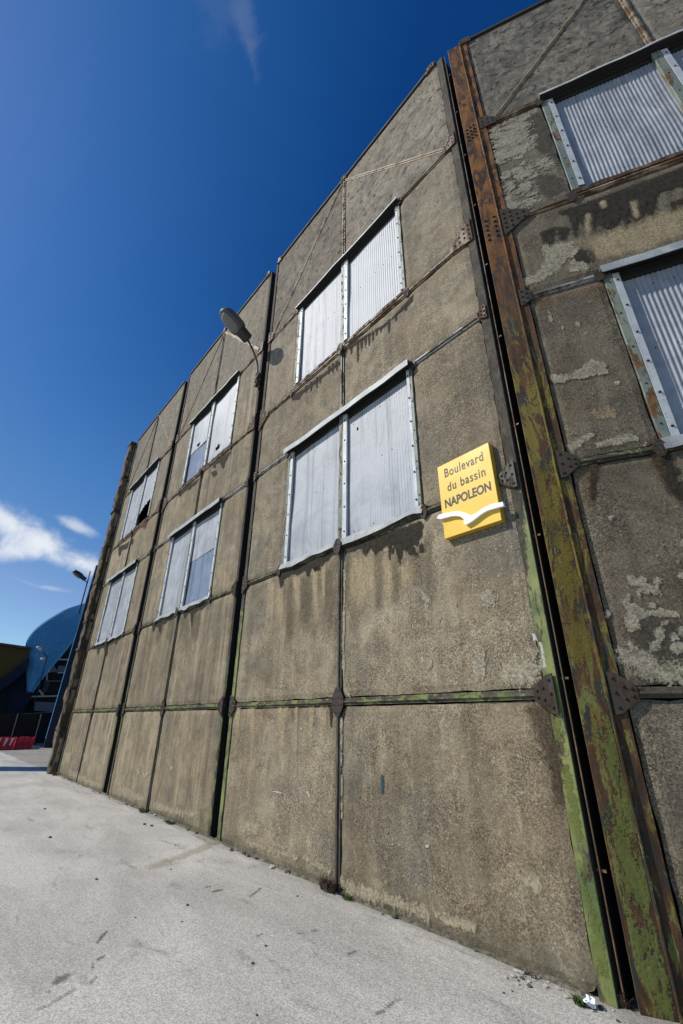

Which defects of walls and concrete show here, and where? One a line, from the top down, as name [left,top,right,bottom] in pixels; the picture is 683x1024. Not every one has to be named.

spalling [487,113,555,209]
spalling [523,241,590,286]
spalling [550,358,620,385]
water stain [270,520,424,623]
spalling [604,575,683,687]
corrosion [524,698,566,810]